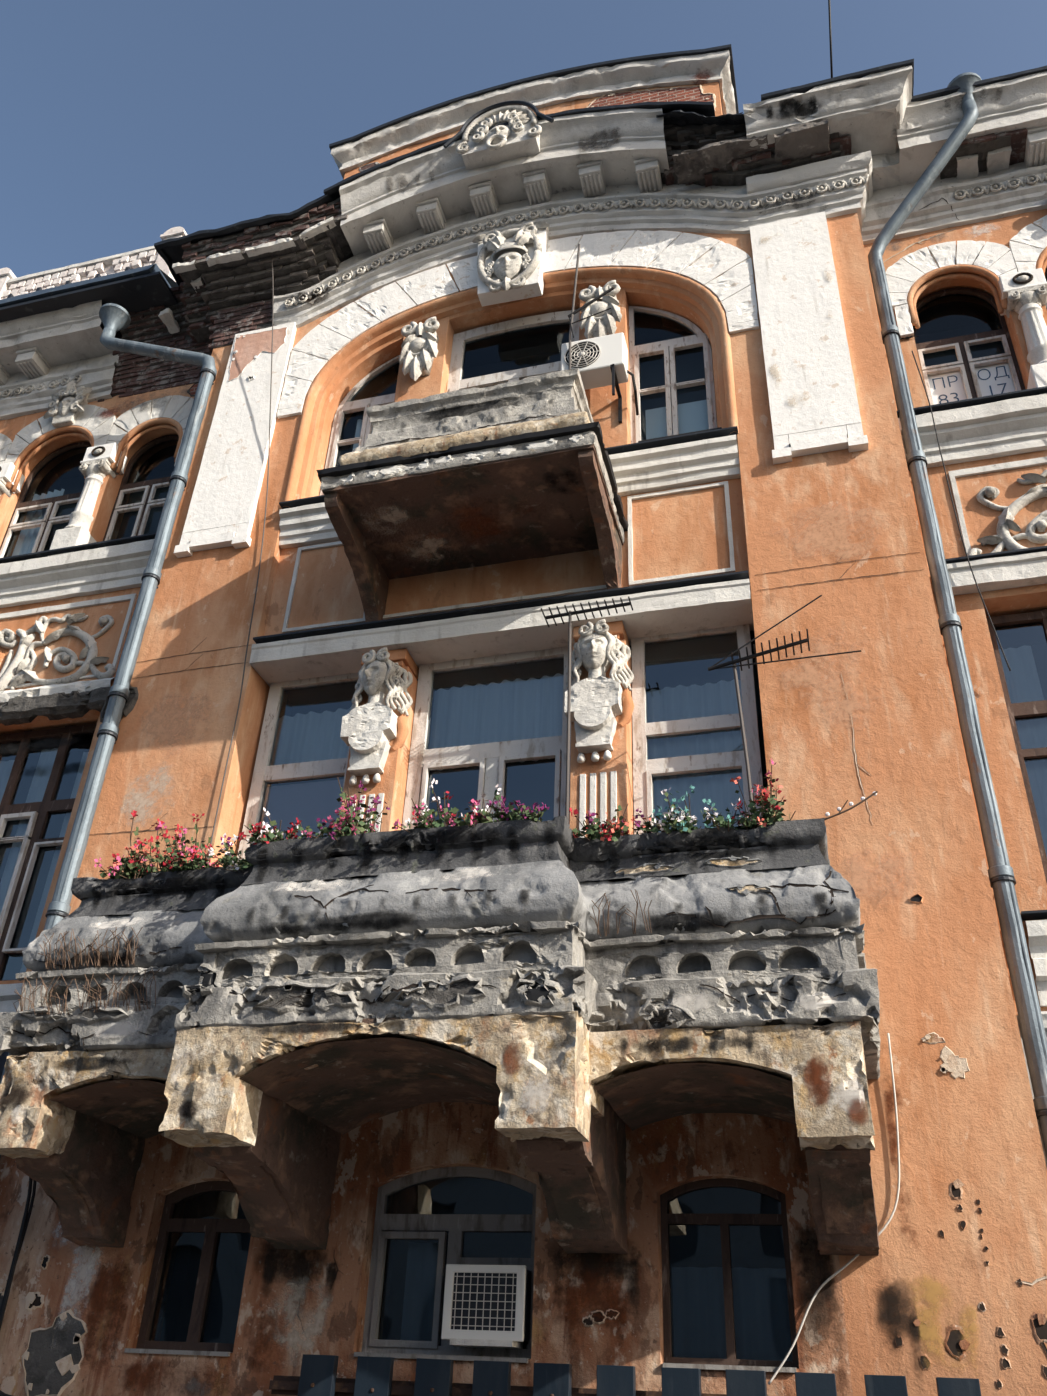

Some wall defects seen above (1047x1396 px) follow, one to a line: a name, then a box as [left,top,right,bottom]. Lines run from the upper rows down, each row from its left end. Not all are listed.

peeling [228,327,288,382]
flaking render [19,1003,129,1025]
flaking render [182,963,224,1005]
flaking render [253,980,359,1015]
flaking render [391,973,486,1012]
flaking render [514,976,564,1007]
peeling [921,1032,970,1079]
damp [259,1243,337,1306]
damp [559,1241,639,1306]
flaking render [22,1292,88,1396]
damp [879,1276,944,1365]